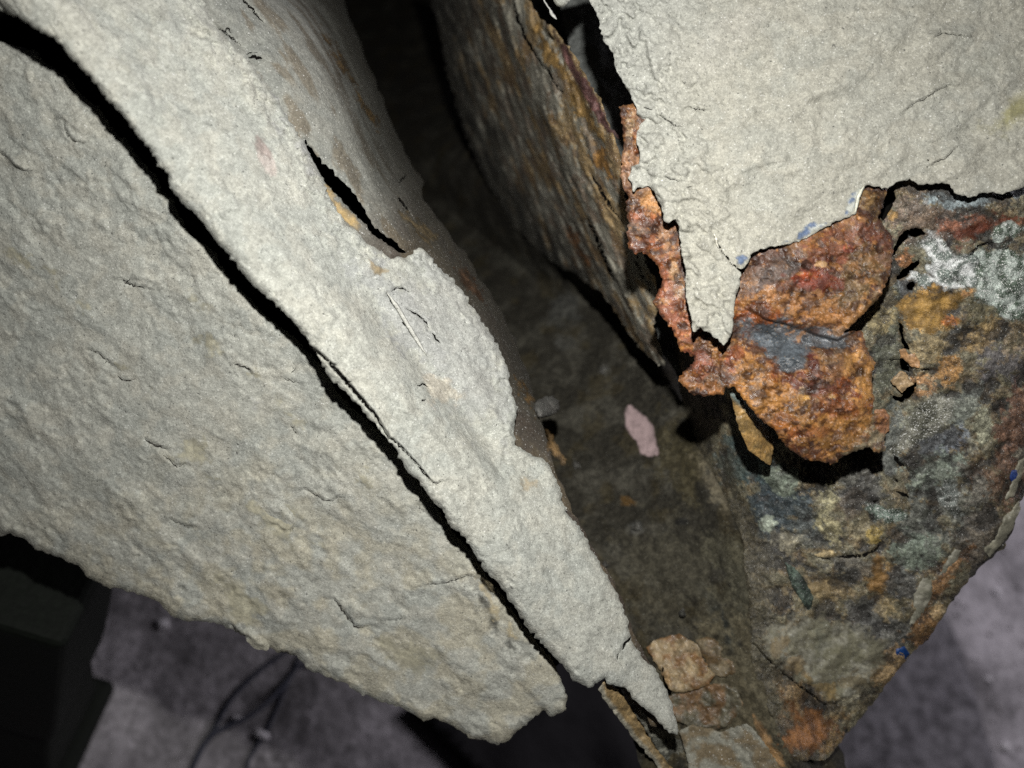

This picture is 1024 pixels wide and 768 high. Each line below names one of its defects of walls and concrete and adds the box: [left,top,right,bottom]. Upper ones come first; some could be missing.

peeling [543,0,570,19]
crack [513,0,562,91]
rust [533,22,955,465]
peeling [797,222,827,239]
peeling [844,186,864,217]
crack [0,11,559,666]
peeling [386,291,427,355]
rust [646,634,743,730]
rust [753,701,835,767]